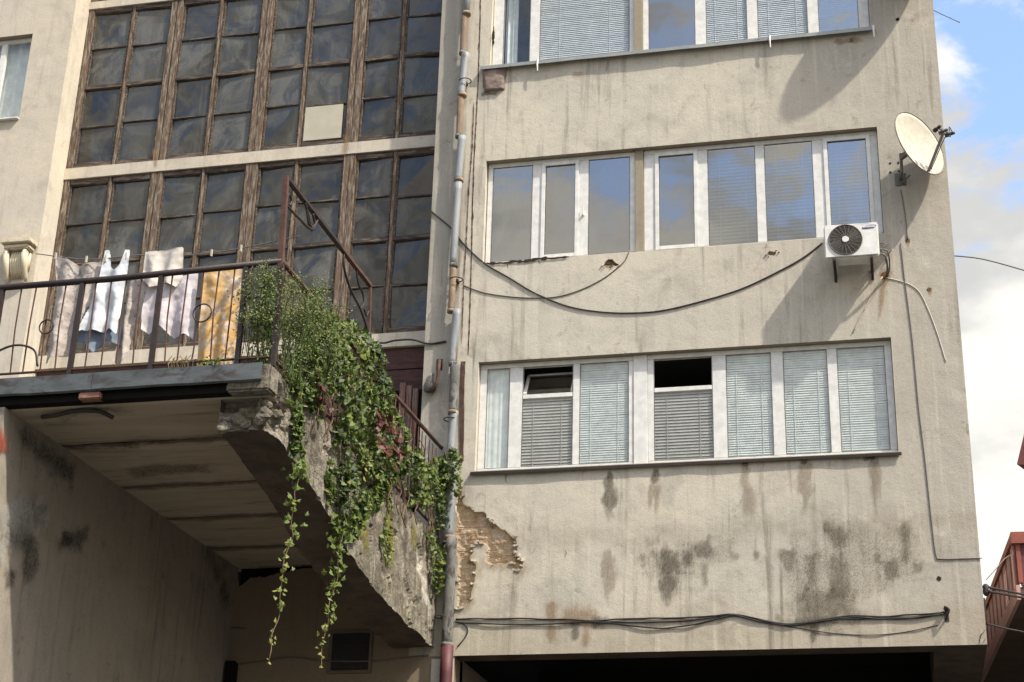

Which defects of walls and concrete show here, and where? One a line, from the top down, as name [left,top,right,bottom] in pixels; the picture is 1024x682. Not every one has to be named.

spalling [216,399,284,434]
damp [604,473,616,508]
spalling [454,489,524,610]
damp [642,542,712,598]
damp [800,524,855,615]